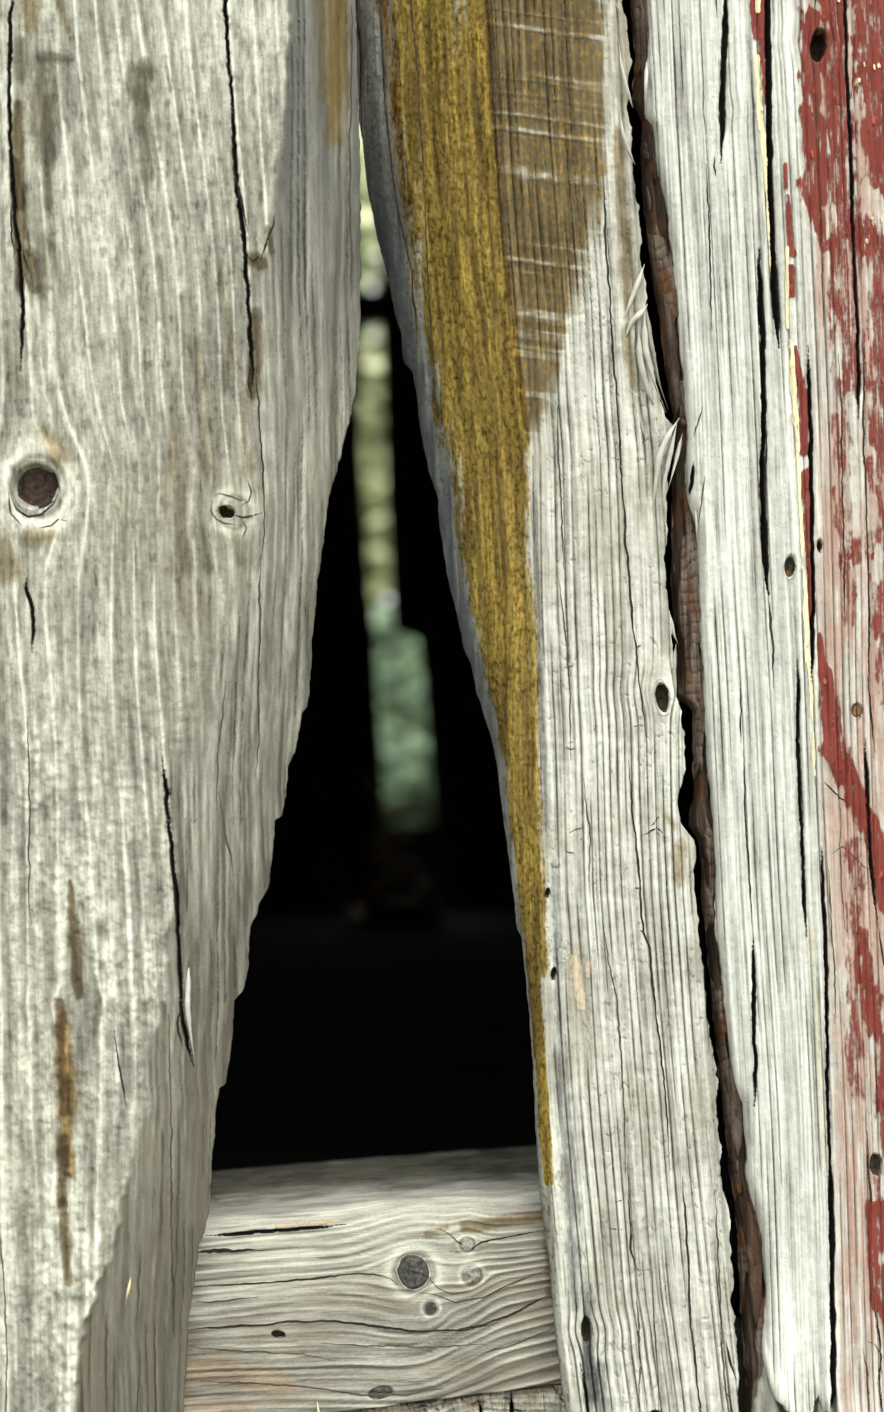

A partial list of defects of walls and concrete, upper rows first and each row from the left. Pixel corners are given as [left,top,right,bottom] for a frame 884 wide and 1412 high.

crack [7,2,29,368]
crack [211,0,276,877]
crack [162,760,589,1412]
crack [706,0,728,326]
crack [739,0,884,1412]
peeling [749,0,884,1326]